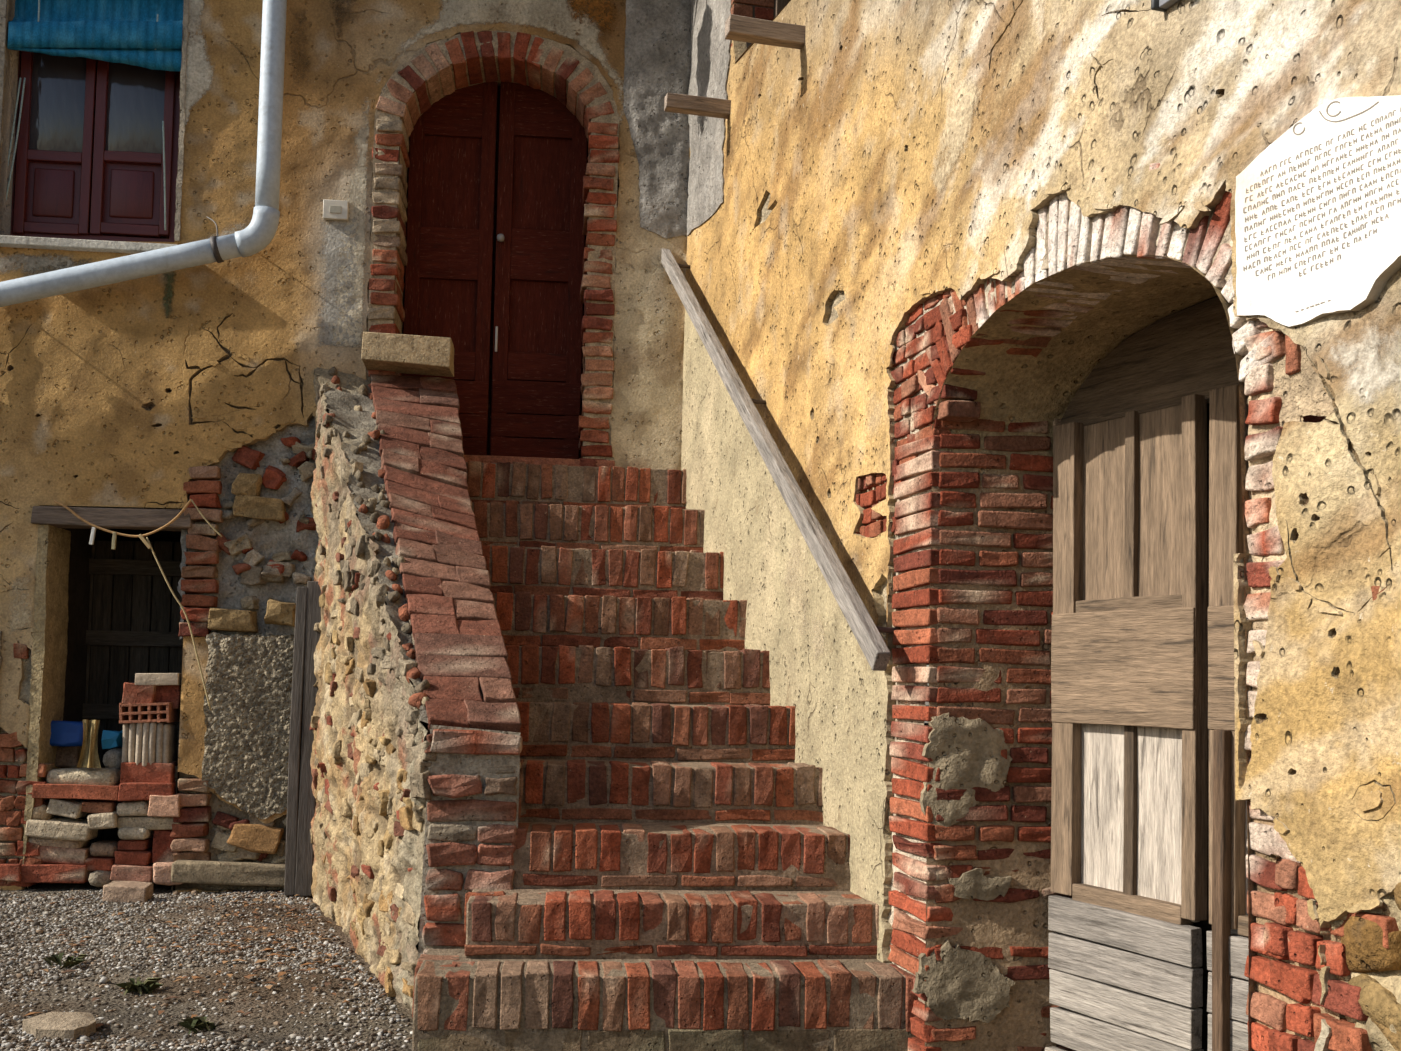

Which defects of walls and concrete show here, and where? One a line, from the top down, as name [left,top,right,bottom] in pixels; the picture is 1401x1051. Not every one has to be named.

spalling [1091,202,1116,227]
spalling [1155,202,1233,281]
crack [185,313,304,437]
spalling [1242,320,1335,435]
spalling [1248,454,1274,467]
crack [1316,356,1391,549]
spalling [177,416,319,639]
spalling [855,184,1071,976]
spalling [1251,619,1268,661]
spalling [1247,490,1299,594]
spalling [0,728,55,888]
spalling [1253,850,1401,1051]